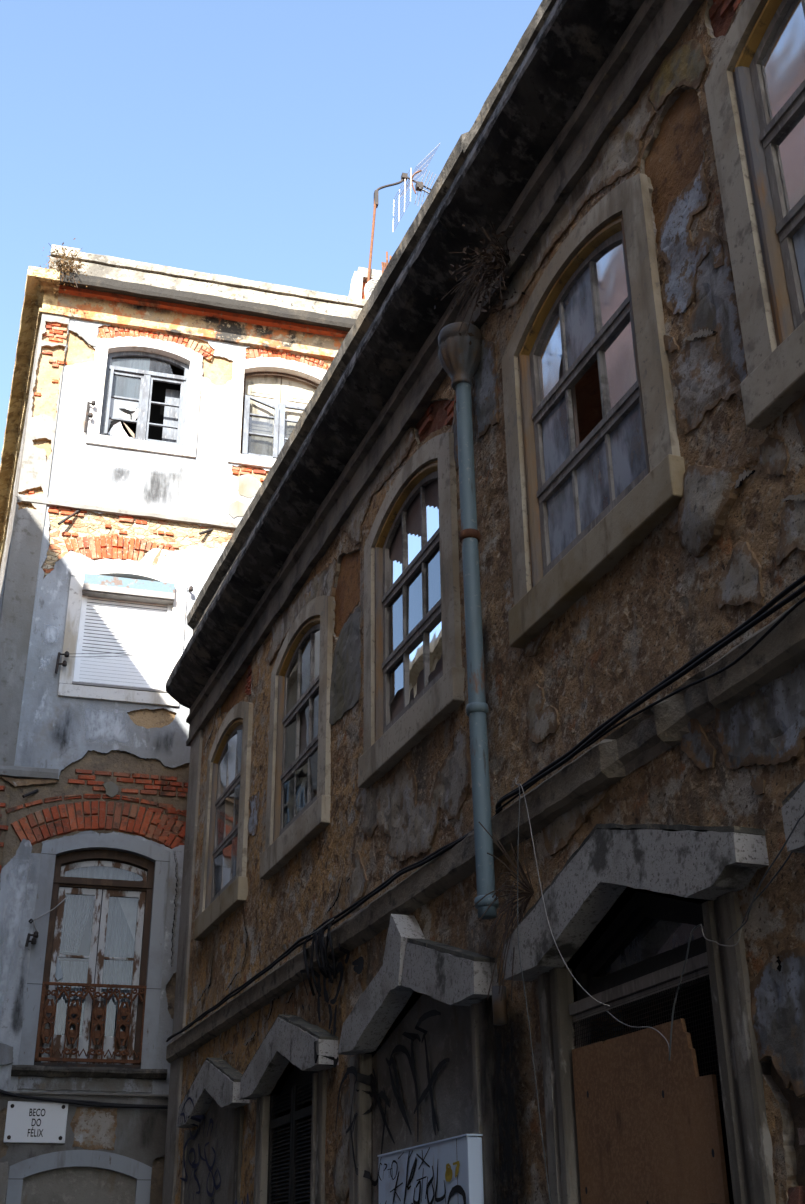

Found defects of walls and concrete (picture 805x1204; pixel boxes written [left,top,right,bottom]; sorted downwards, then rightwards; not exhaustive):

flaking render [489,0,748,435]
spalling [31,321,332,420]
spalling [32,438,52,461]
spalling [17,465,269,579]
spalling [127,708,176,729]
spalling [0,750,190,890]
spalling [165,972,176,1019]
flaking render [750,947,805,1204]